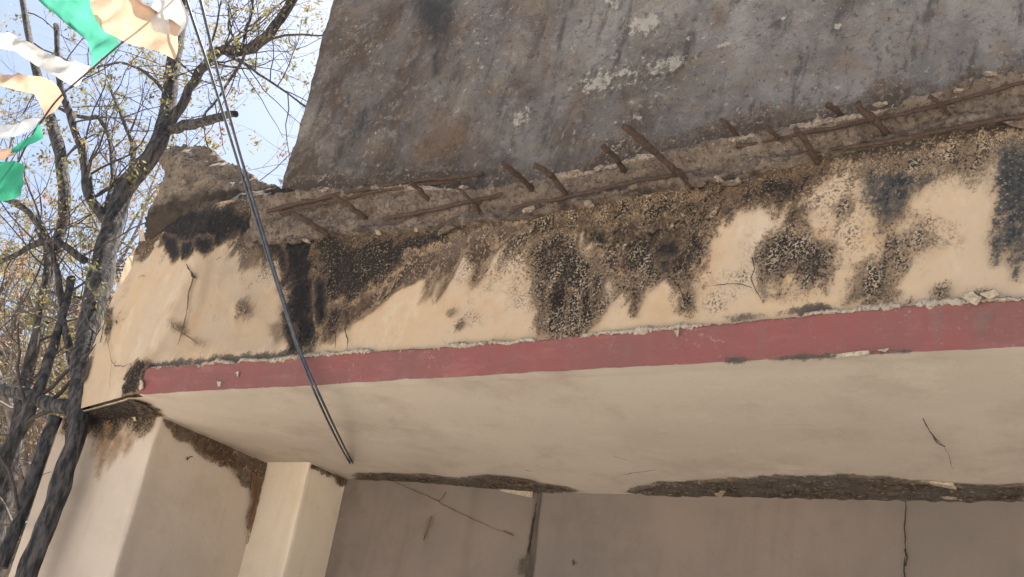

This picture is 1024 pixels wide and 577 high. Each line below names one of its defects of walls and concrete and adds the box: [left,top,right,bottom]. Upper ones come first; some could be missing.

spalling [244,57,1024,346]
damp [135,126,1024,367]
crack [171,264,198,344]
crack [923,418,951,463]
spalling [625,474,1024,503]
crack [901,501,909,577]